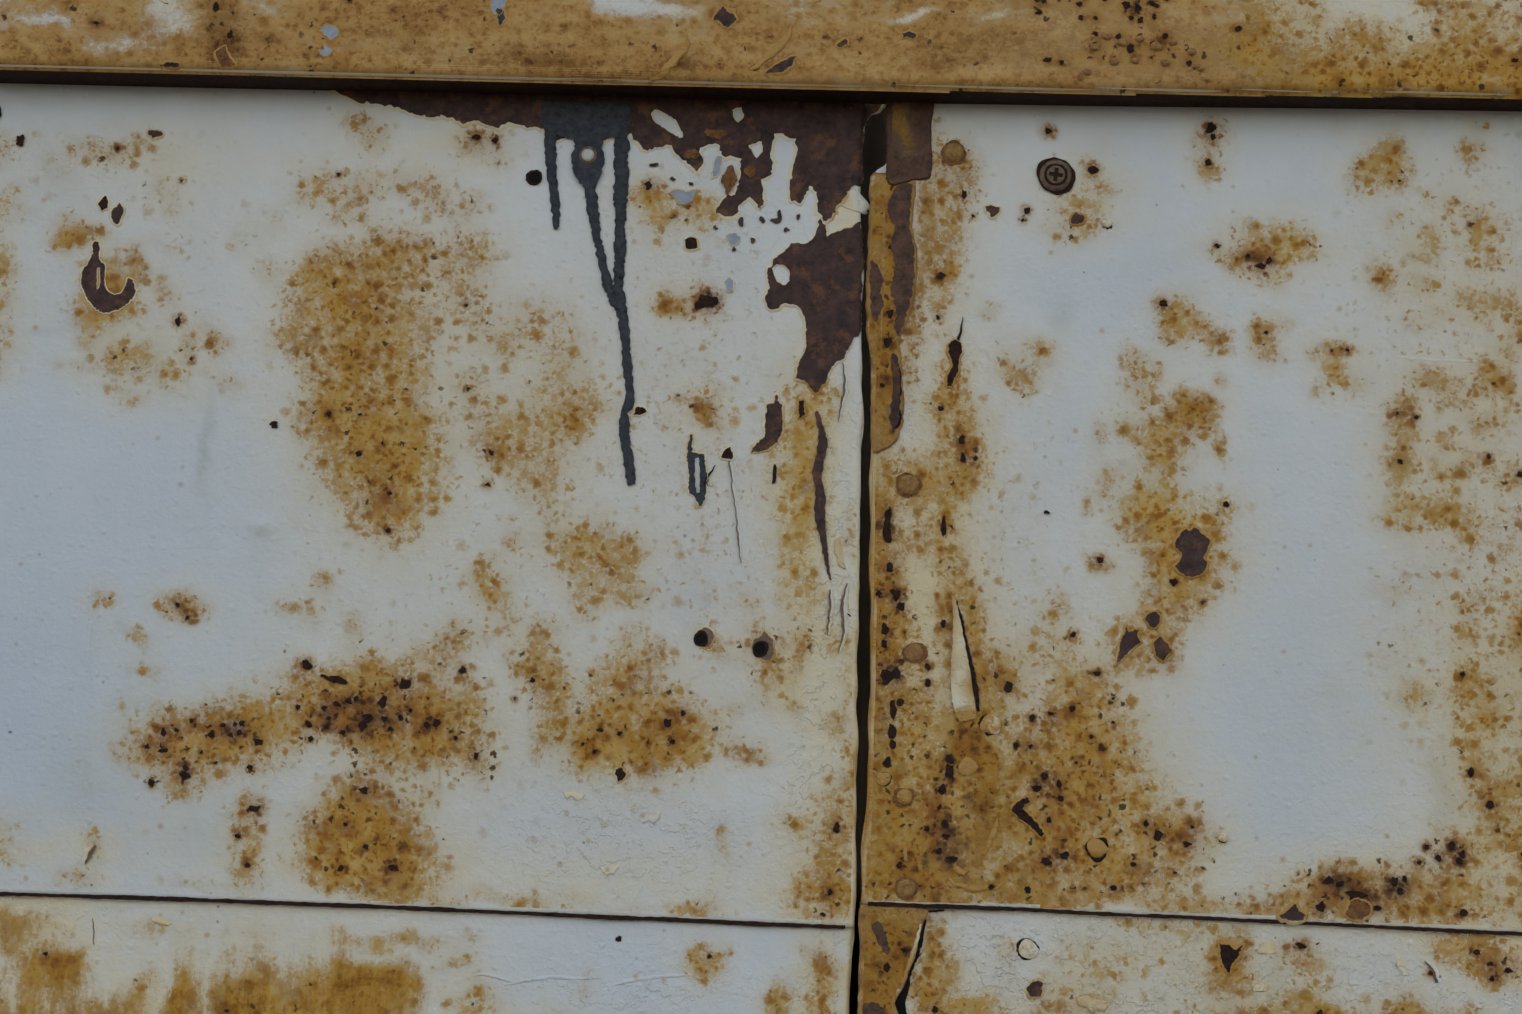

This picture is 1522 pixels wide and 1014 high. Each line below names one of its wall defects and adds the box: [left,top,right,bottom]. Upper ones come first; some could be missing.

corrosion [0,0,1522,142]
peeling [78,239,140,315]
peeling [96,194,126,227]
peeling [330,34,915,484]
corrosion [652,286,724,350]
corrosion [272,168,649,620]
corrosion [784,137,1522,1014]
corrosion [113,559,764,905]
corrosion [0,909,424,1014]
peeling [862,1002,888,1014]
peeling [871,921,890,954]
peeling [908,980,920,997]